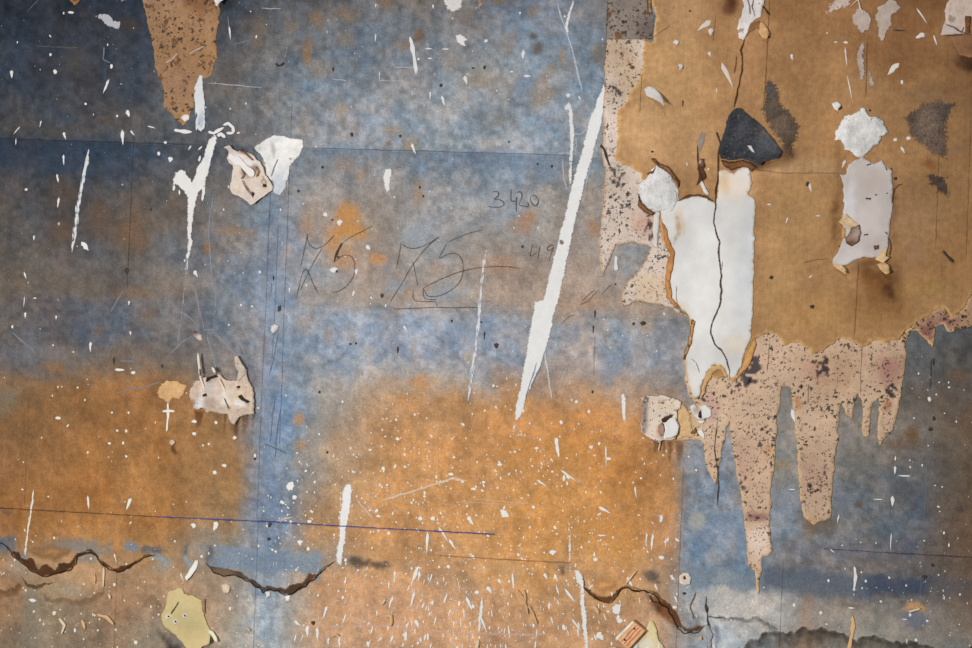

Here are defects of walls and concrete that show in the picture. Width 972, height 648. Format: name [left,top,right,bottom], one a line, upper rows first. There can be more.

peeling [758,22,769,39]
crack [734,40,744,106]
peeling [647,158,679,188]
peeling [637,194,655,215]
crack [697,132,730,378]
peeling [875,248,890,274]
spalling [690,404,712,439]
crack [0,542,153,577]
crack [209,562,334,596]
crack [582,578,723,648]
damp [745,627,933,648]